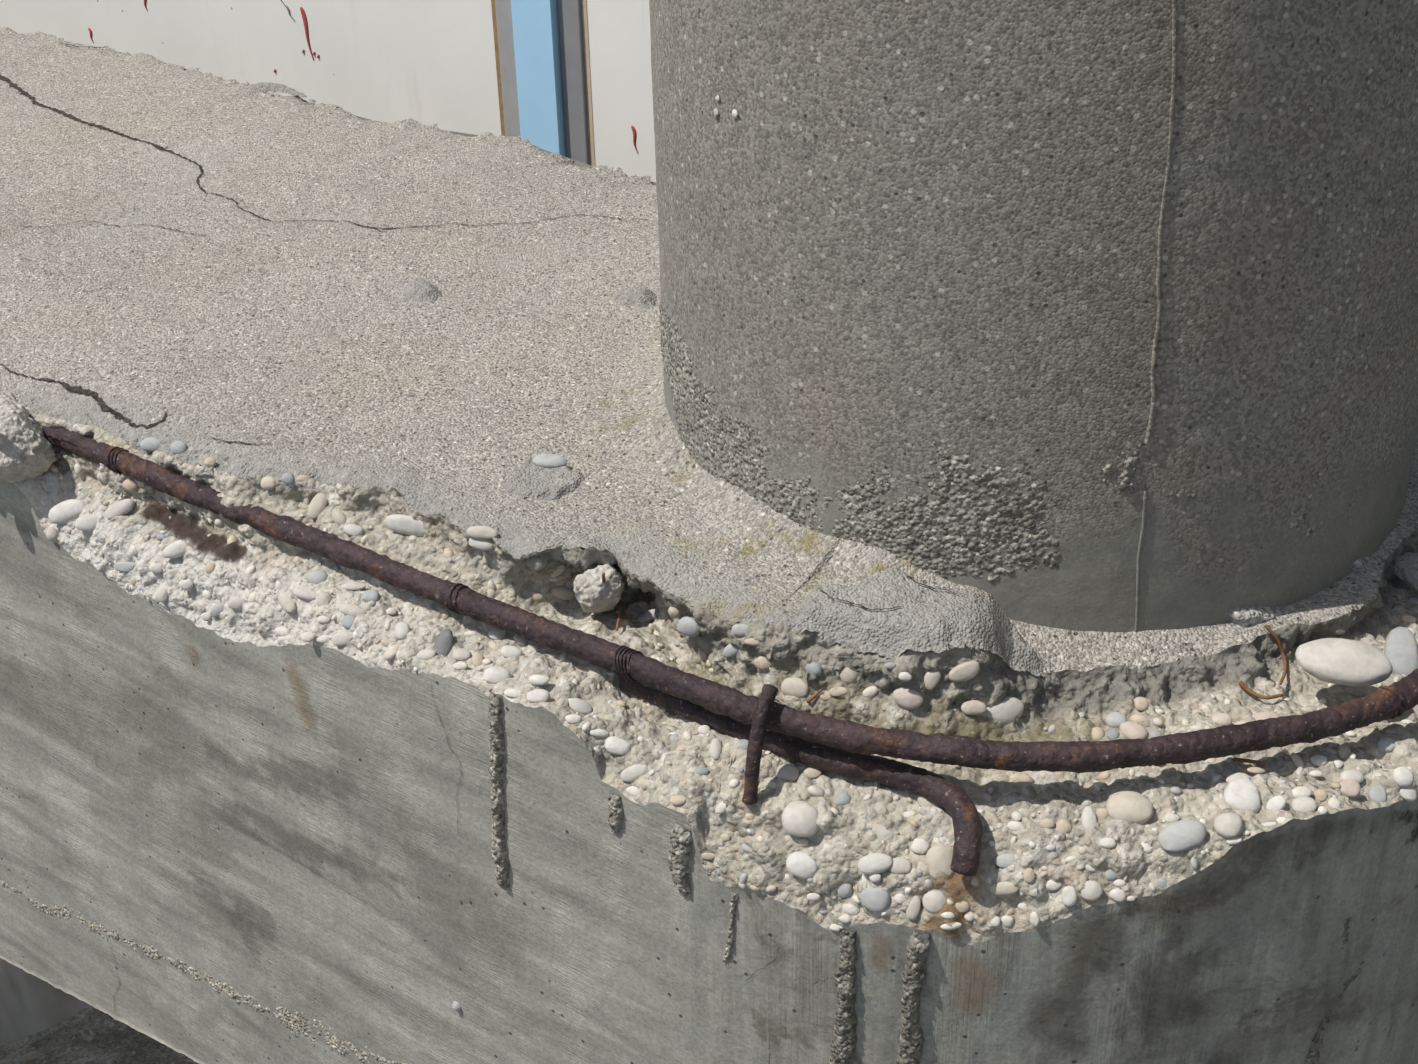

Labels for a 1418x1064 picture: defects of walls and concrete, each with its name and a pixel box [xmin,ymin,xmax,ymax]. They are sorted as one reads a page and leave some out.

crack [0,75,648,232]
crack [1,364,168,428]
spalling [14,412,1418,946]